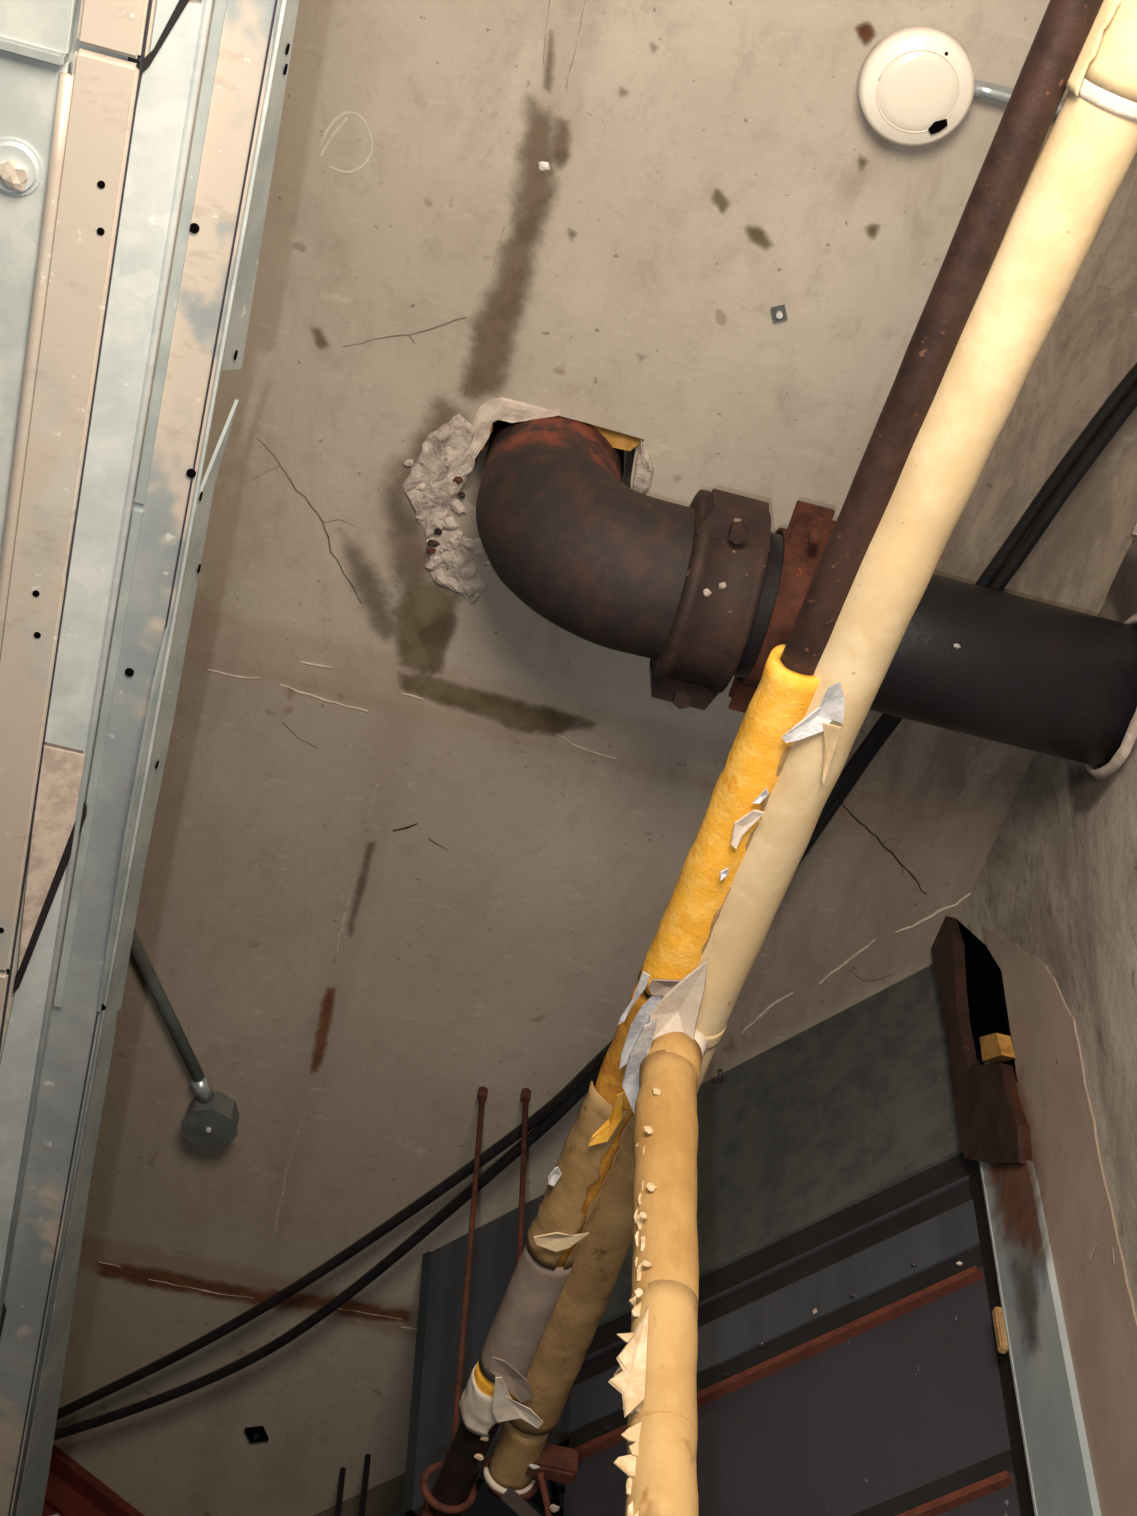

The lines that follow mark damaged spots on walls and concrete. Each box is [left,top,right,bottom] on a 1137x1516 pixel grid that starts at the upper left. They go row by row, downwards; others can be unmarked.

damp [464,105,568,397]
damp [354,410,592,734]
spalling [402,397,560,604]
spalling [632,440,654,495]
corrosion [312,989,334,1071]
corrosion [990,1085,1047,1257]
corrosion [1014,1266,1036,1342]